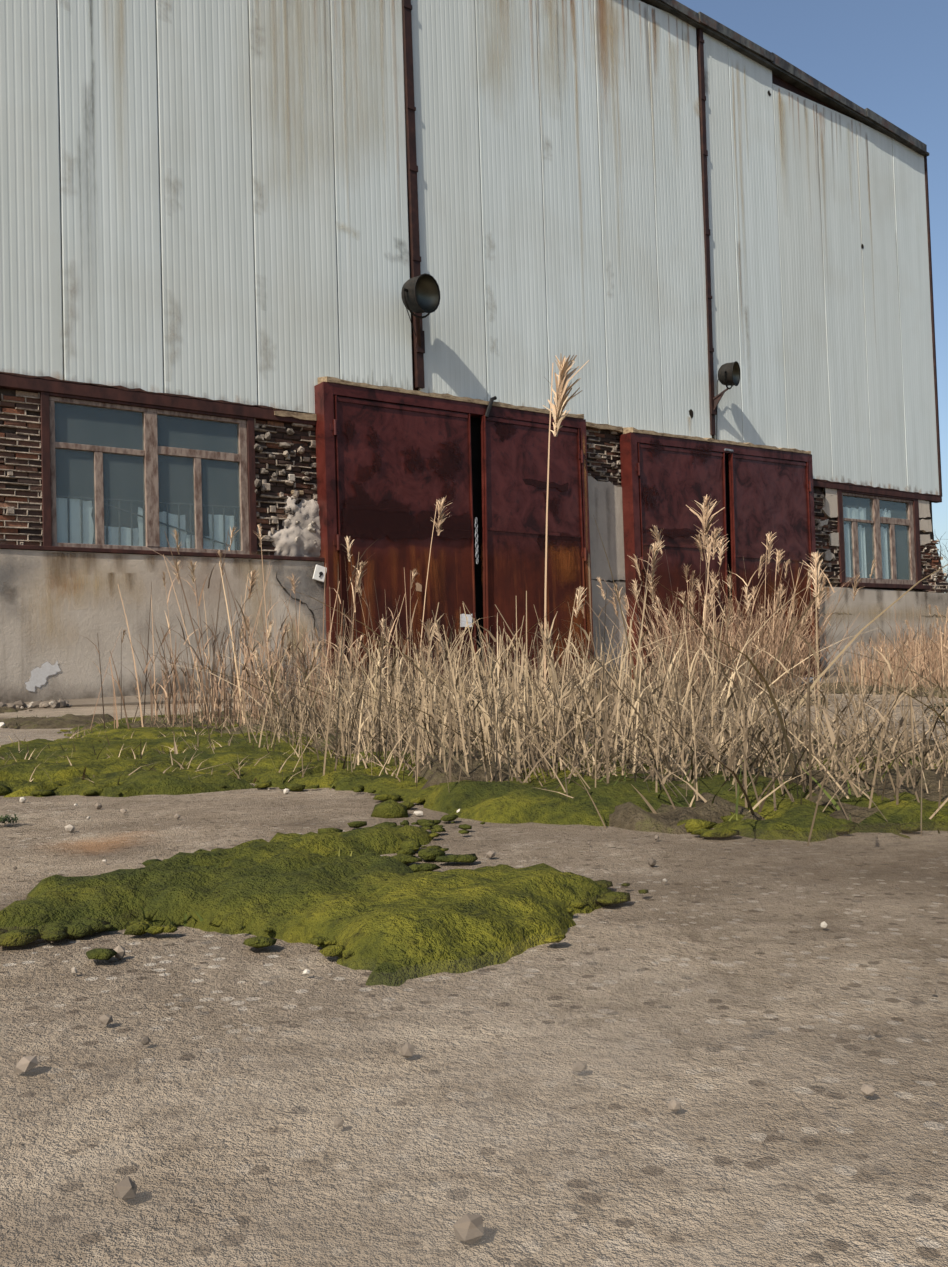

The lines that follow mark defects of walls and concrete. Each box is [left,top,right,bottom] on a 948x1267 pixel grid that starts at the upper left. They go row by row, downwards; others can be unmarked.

spalling [0,390,43,546]
spalling [254,418,317,556]
rust [342,481,472,542]
crack [276,573,323,643]